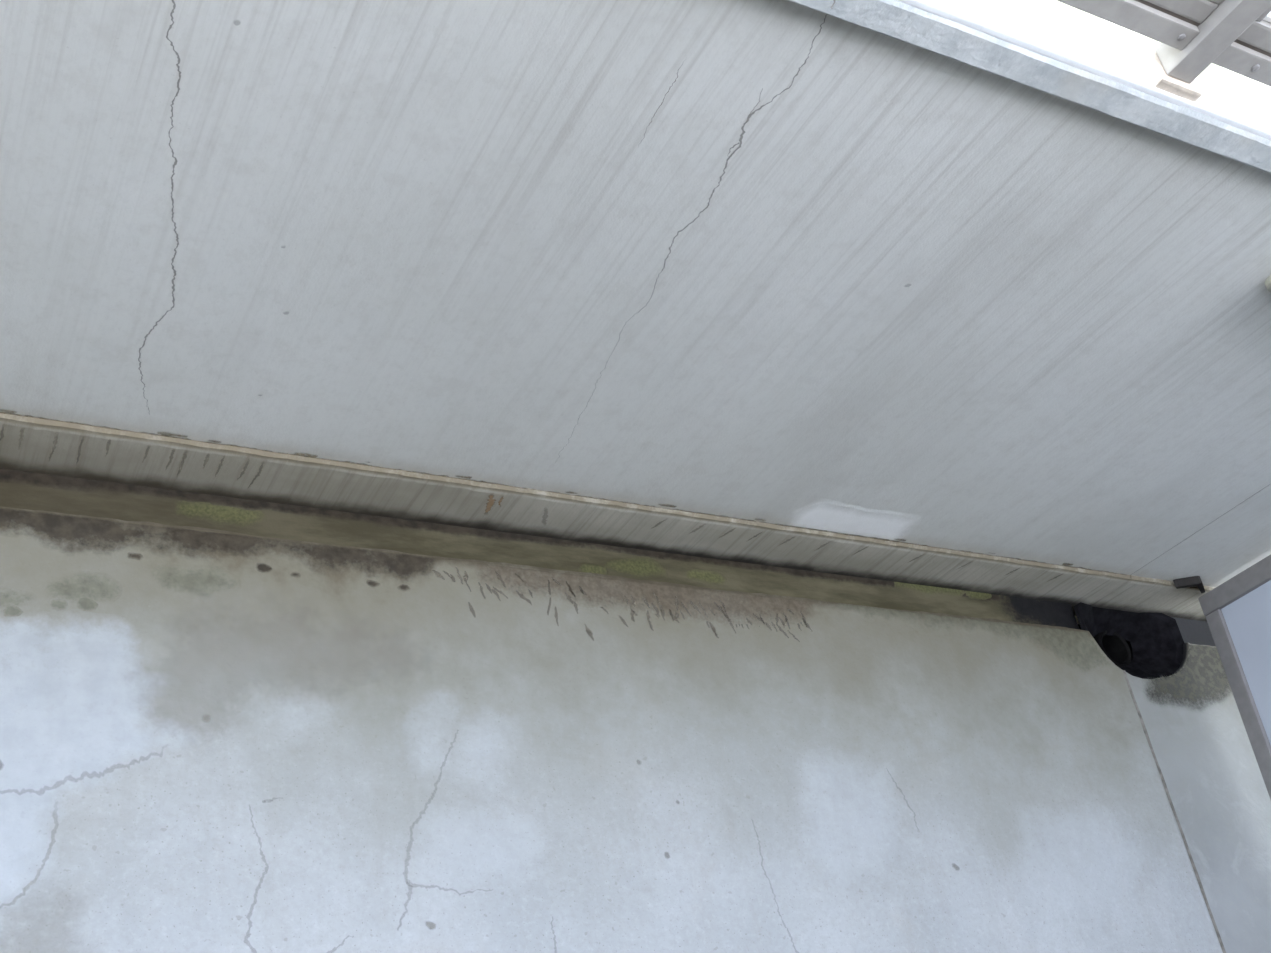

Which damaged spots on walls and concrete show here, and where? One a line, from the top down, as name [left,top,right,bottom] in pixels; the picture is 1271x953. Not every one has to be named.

crack [138,0,181,412]
crack [559,0,835,453]
water stain [0,506,1113,920]
water stain [1147,645,1230,709]